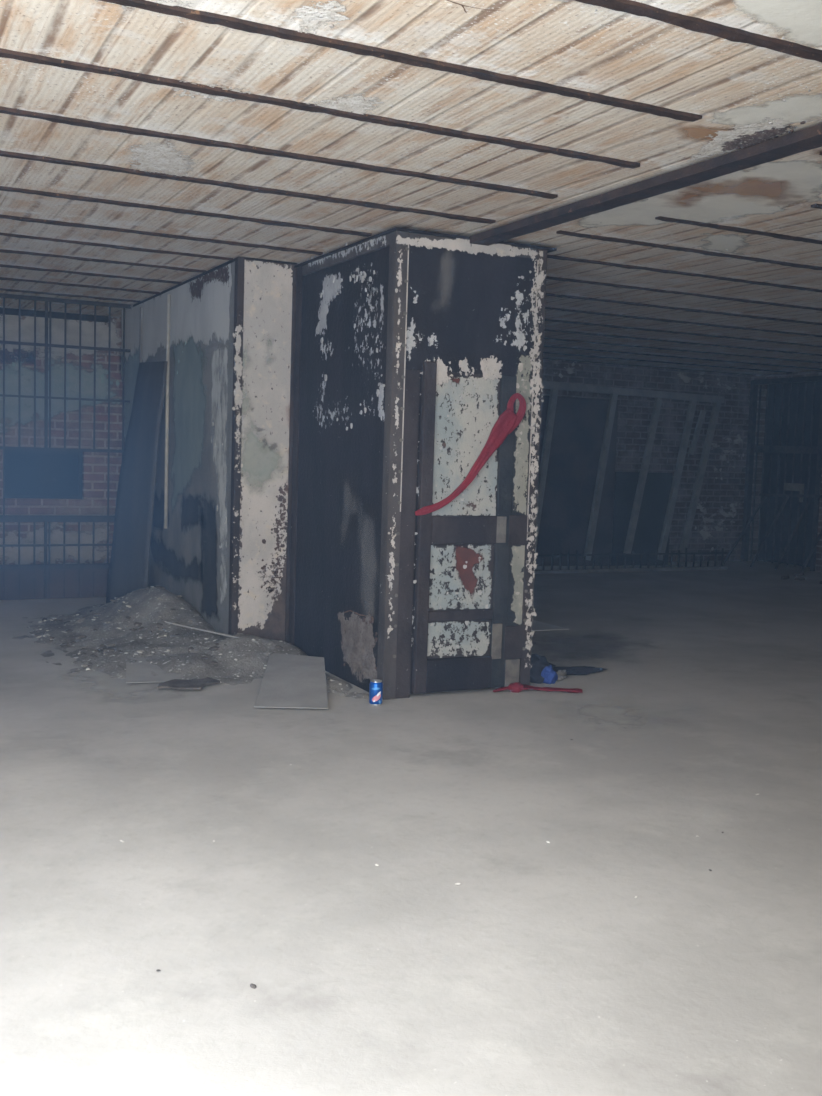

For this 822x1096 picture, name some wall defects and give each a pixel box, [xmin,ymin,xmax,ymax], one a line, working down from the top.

peeling [0,260,293,631]
water stain [150,493,217,617]
peeling [306,235,581,683]